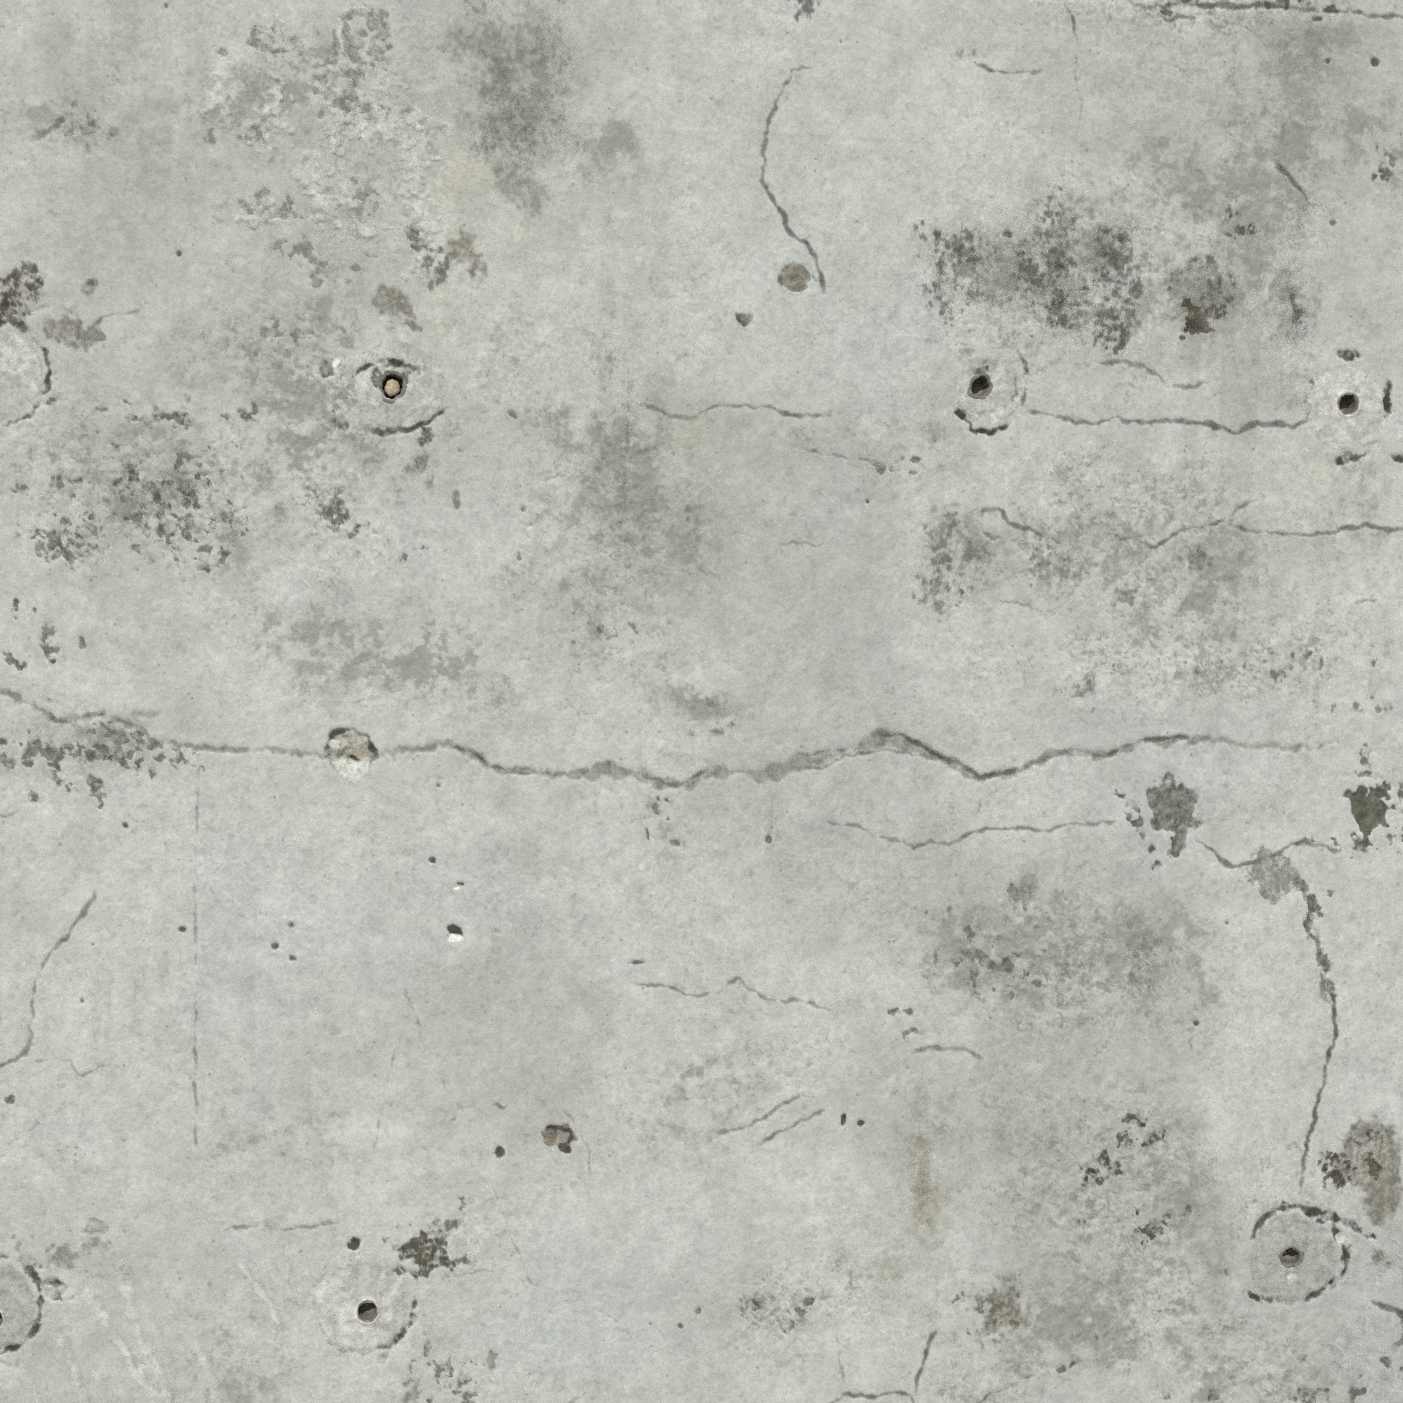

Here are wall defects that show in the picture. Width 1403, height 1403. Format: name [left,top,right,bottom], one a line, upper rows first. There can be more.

crack [1161,1,1283,20]
crack [762,180,824,286]
damp [923,266,983,326]
damp [1019,226,1144,354]
crack [1125,419,1300,432]
crack [113,717,330,757]
hole [325,728,377,782]
crack [399,729,1302,789]
spalling [1115,772,1200,870]
spalling [1331,744,1403,858]
spalling [1249,846,1300,904]
crack [1211,840,1338,1165]